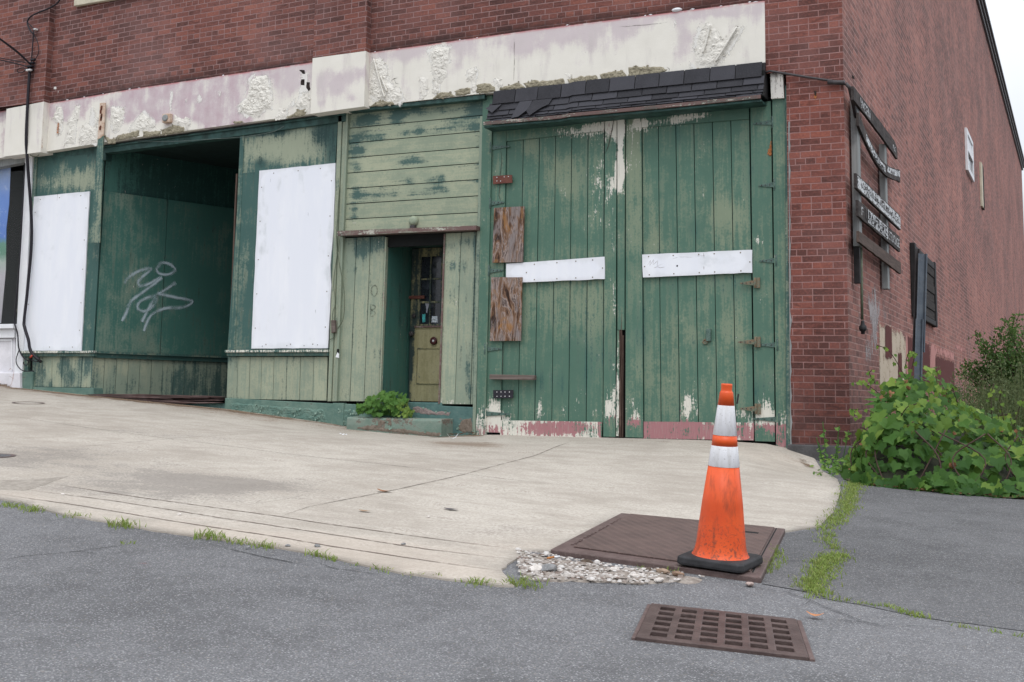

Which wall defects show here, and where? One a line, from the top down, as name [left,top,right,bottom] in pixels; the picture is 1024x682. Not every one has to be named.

spalling [690,22,744,69]
spalling [233,74,306,124]
spalling [52,104,191,146]